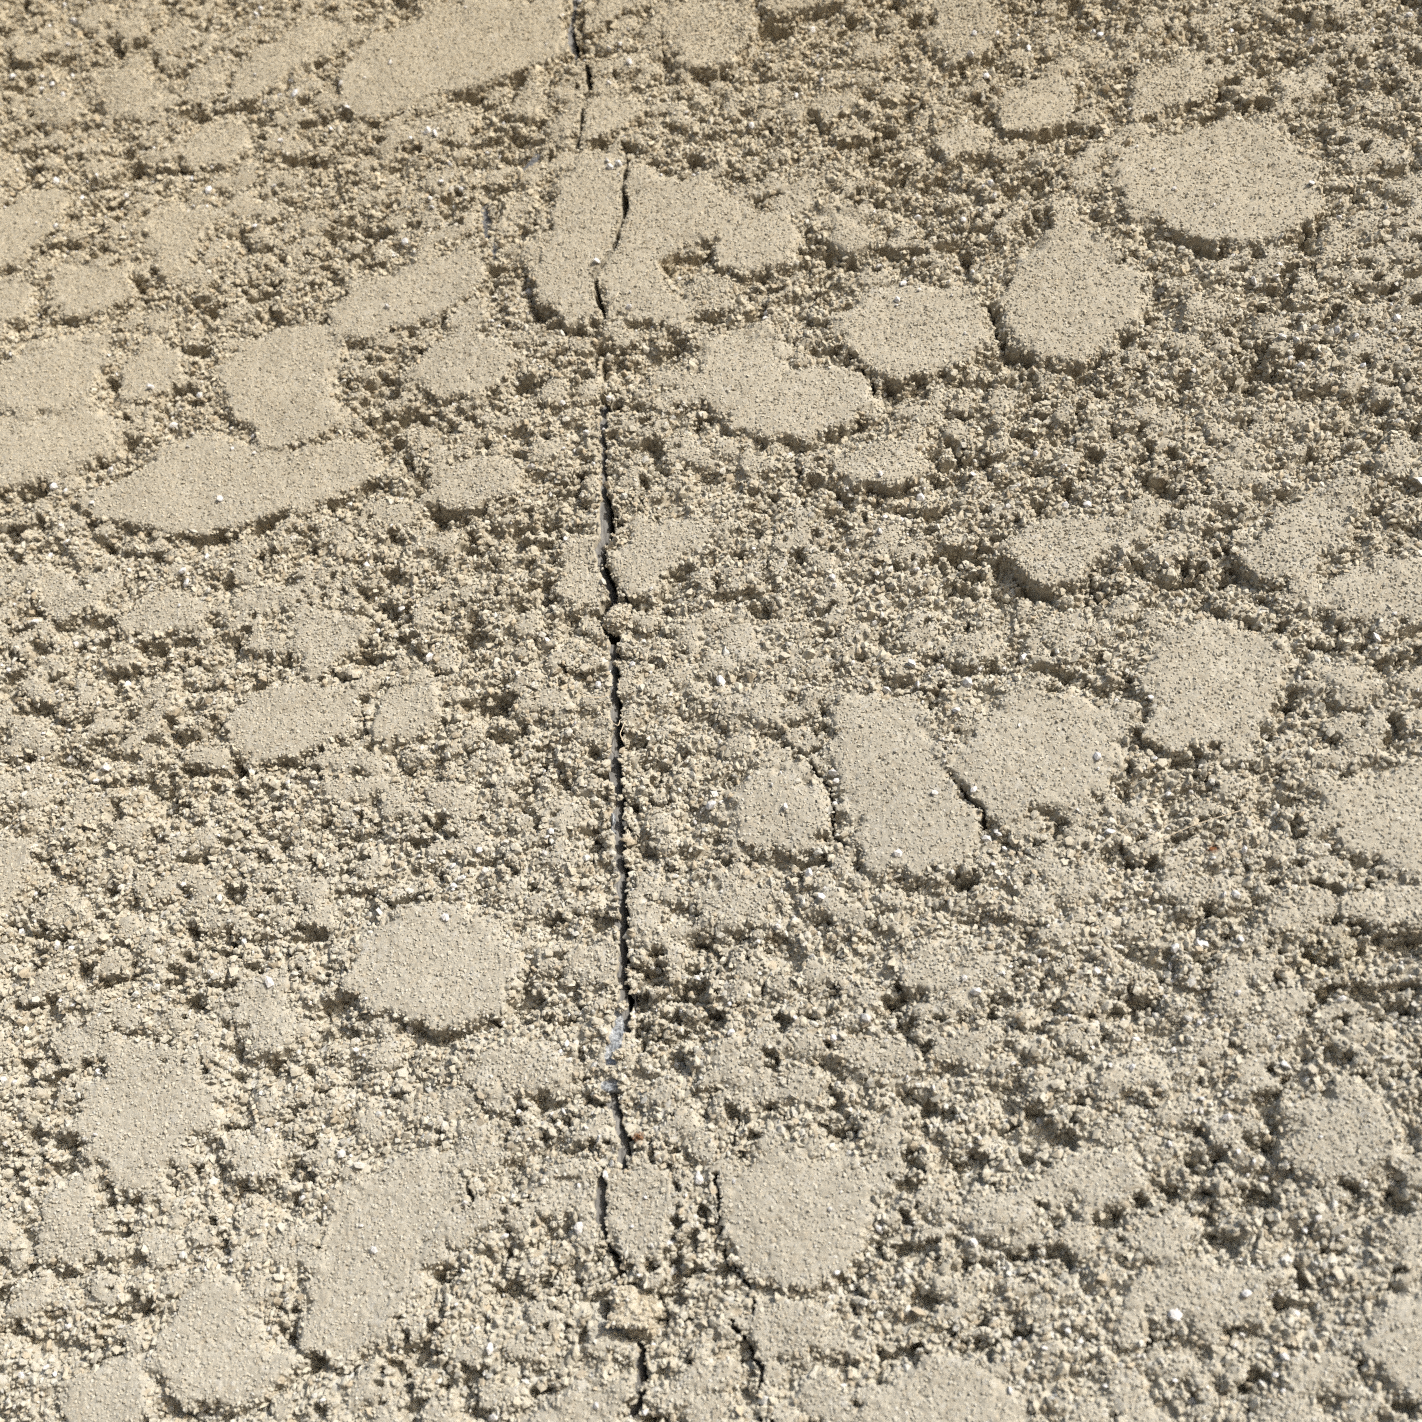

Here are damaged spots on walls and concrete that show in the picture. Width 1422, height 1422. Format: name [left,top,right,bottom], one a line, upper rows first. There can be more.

crack [566,0,585,61]
crack [595,406,633,613]
crack [606,644,639,1032]
crack [594,1093,635,1285]
crack [629,1344,656,1422]